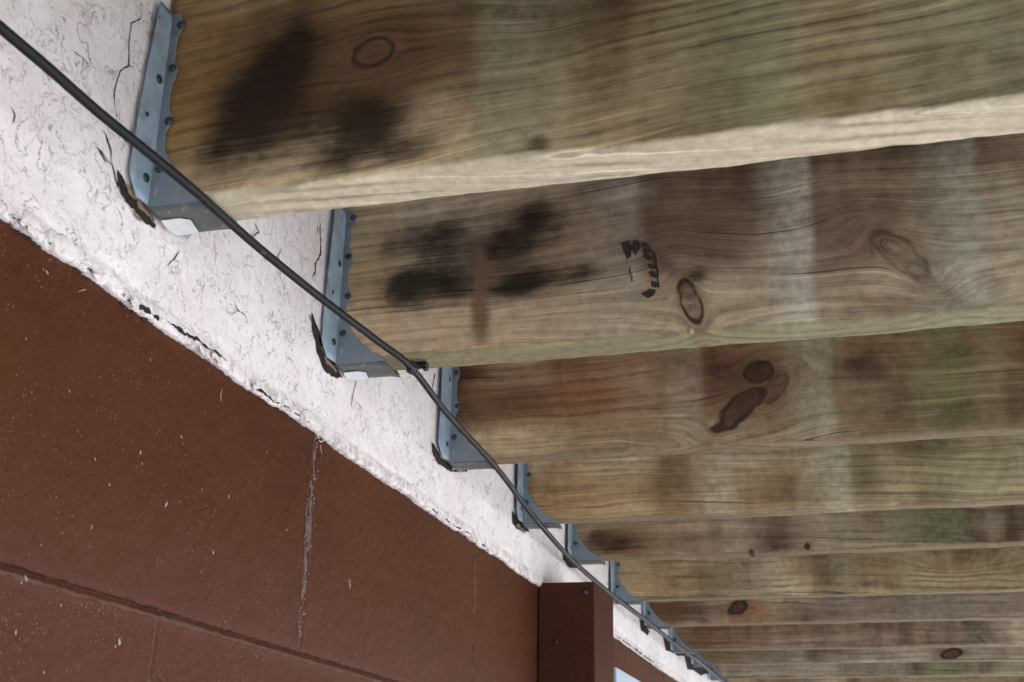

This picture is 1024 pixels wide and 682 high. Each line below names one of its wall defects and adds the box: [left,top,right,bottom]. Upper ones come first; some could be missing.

crack [95,13,142,192]
water stain [202,22,422,171]
spalling [117,171,156,230]
spalling [120,294,227,367]
spalling [312,313,342,378]
water stain [386,205,591,336]